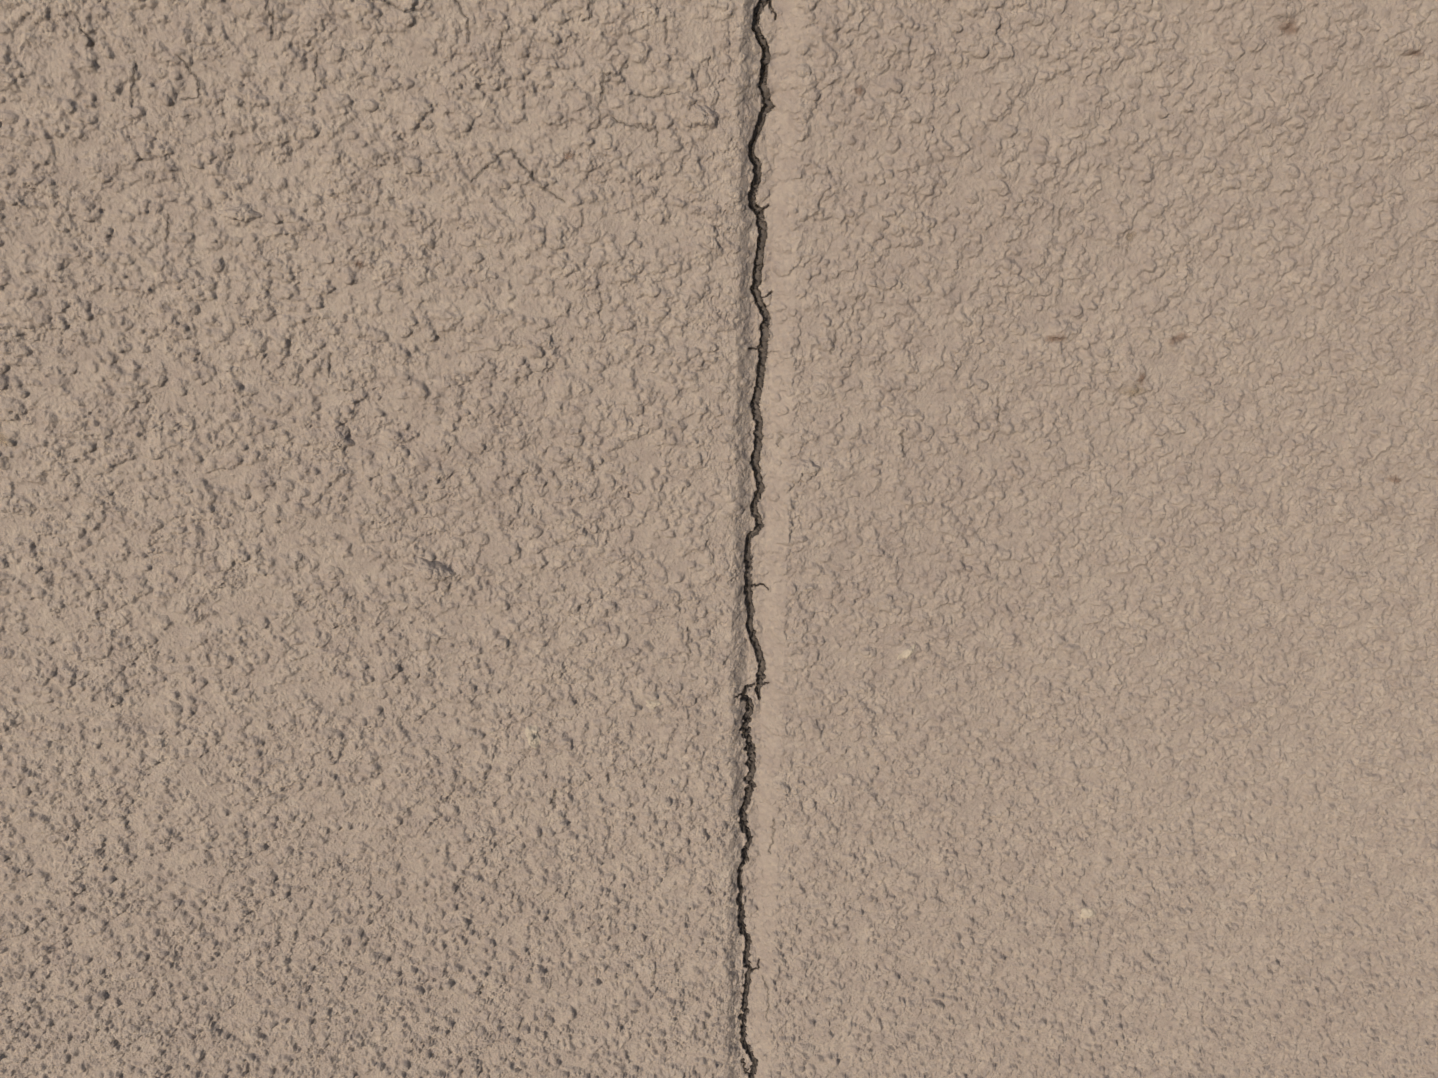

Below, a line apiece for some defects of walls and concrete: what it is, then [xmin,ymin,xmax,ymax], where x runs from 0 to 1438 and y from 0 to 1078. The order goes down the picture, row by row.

crack [712,0,784,1078]